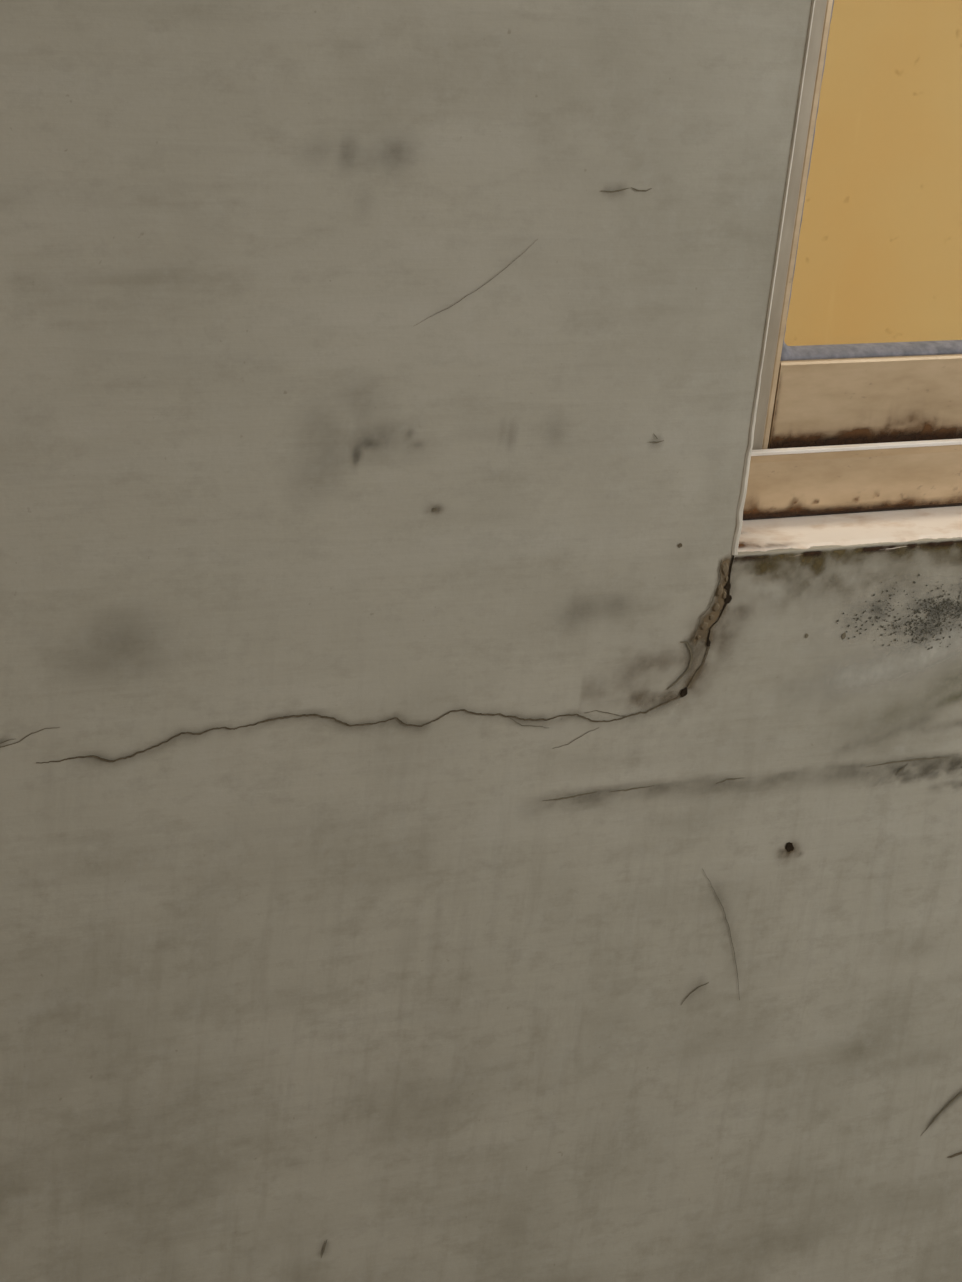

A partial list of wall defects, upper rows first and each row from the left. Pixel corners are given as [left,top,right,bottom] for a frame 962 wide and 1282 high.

damp [735,556,779,575]
damp [804,551,825,575]
damp [863,541,962,557]
damp [832,574,962,689]
crack [0,555,734,763]
crack [922,1092,962,1134]